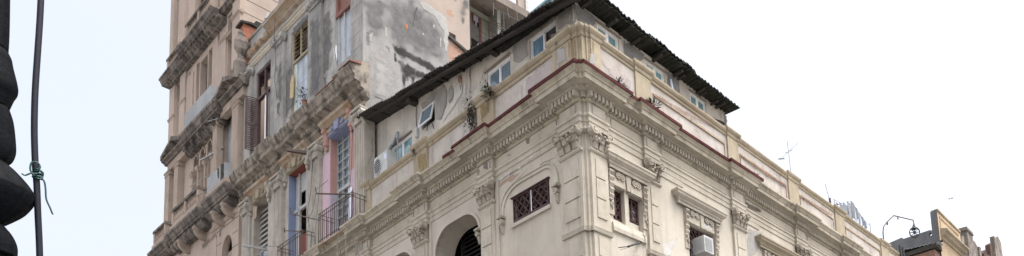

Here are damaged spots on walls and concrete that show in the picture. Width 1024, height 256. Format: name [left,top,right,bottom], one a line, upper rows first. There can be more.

water stain [367,0,441,85]